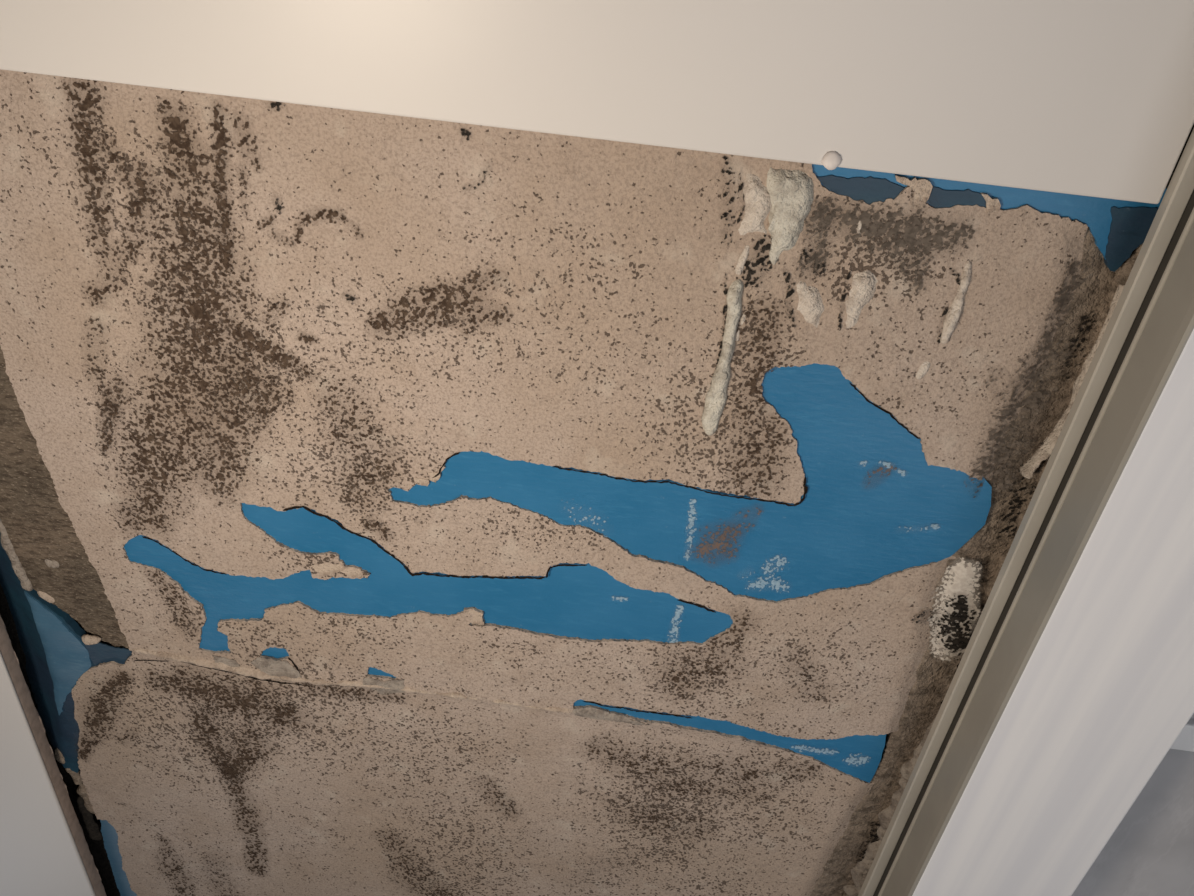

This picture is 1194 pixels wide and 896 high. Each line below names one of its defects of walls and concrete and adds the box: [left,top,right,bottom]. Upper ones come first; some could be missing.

leakage [60,77,404,542]
leakage [365,266,513,342]
leakage [717,234,794,499]
leakage [796,197,975,293]
peeling [812,164,1169,272]
spalling [0,346,137,896]
leakage [77,666,405,877]
peeling [363,667,405,695]
peeling [124,503,733,679]
peeling [389,363,992,601]
peeling [572,699,886,783]
leakage [810,226,1119,896]